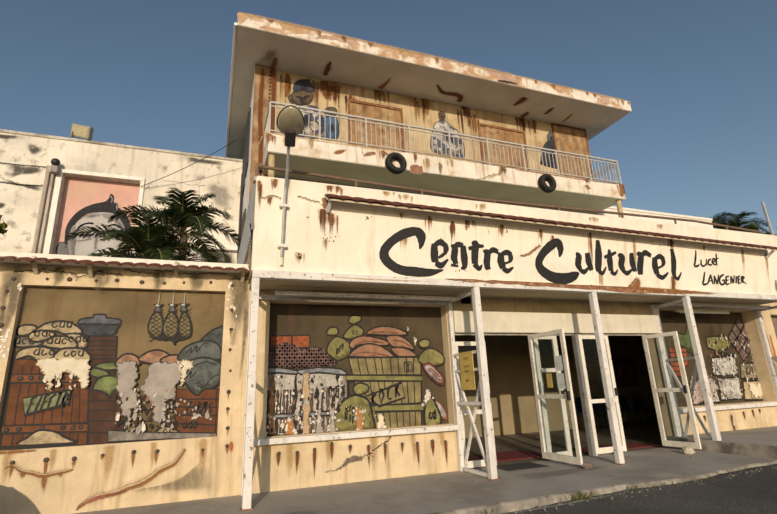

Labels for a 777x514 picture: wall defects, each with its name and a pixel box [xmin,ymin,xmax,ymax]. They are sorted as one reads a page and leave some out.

rust [258,57,291,204]
rust [297,137,387,157]